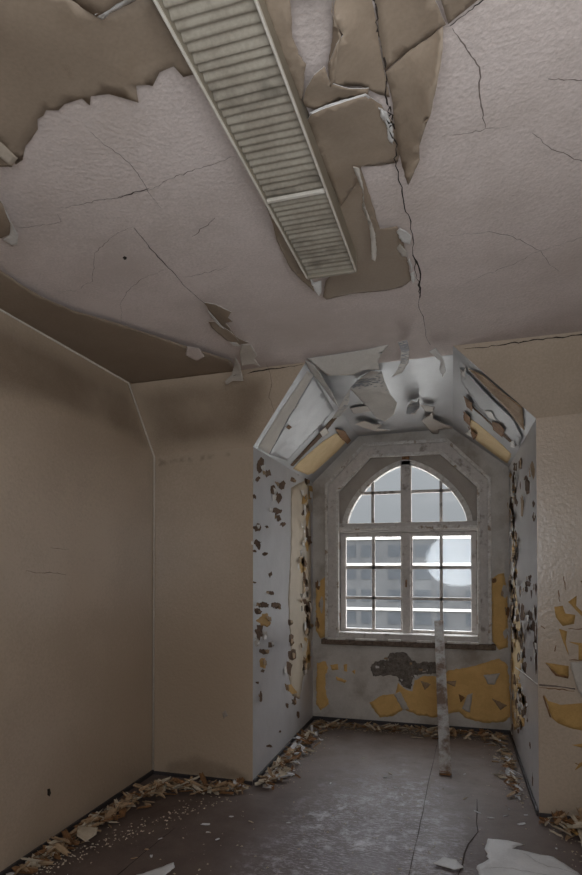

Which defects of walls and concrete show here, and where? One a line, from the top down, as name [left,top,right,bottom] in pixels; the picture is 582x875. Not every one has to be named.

peeling [0,200,18,246]
peeling [0,0,193,167]
crack [19,134,234,228]
peeling [0,270,260,385]
crack [63,227,214,316]
peeling [265,0,477,300]
crack [373,0,430,344]
crack [415,0,507,136]
peeling [251,340,452,718]
peeling [370,367,582,797]
crack [458,807,478,875]